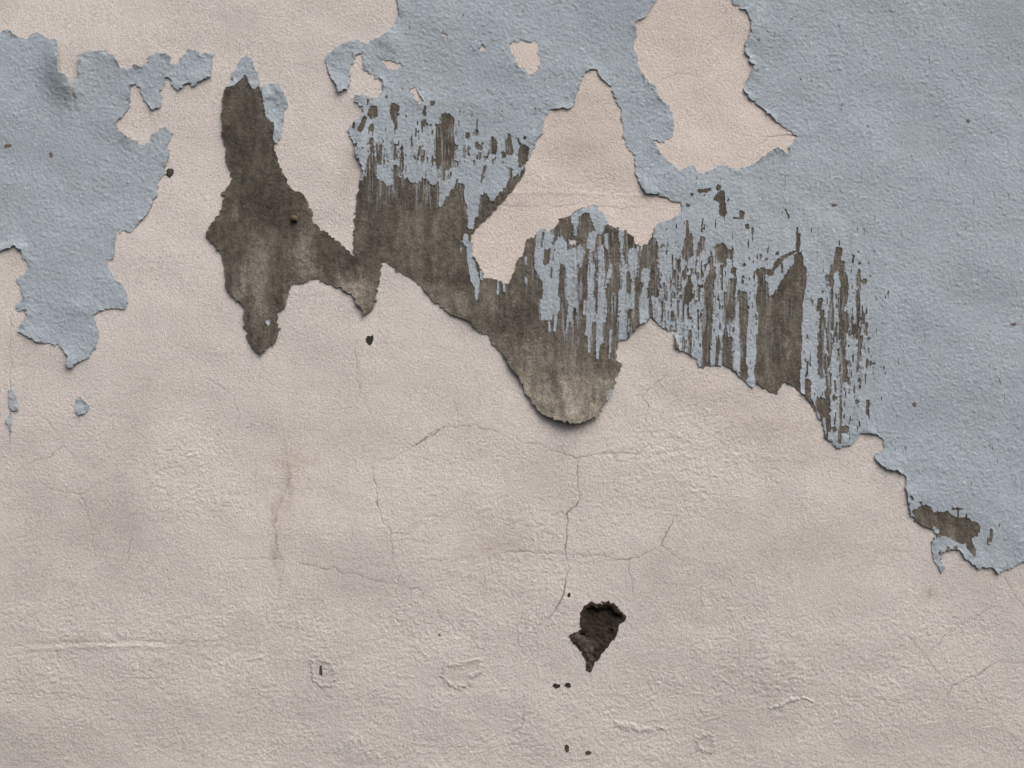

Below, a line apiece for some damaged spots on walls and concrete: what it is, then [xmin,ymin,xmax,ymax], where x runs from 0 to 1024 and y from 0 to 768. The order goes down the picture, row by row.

peeling [0,29,214,368]
peeling [206,0,1024,574]
spalling [569,601,626,672]